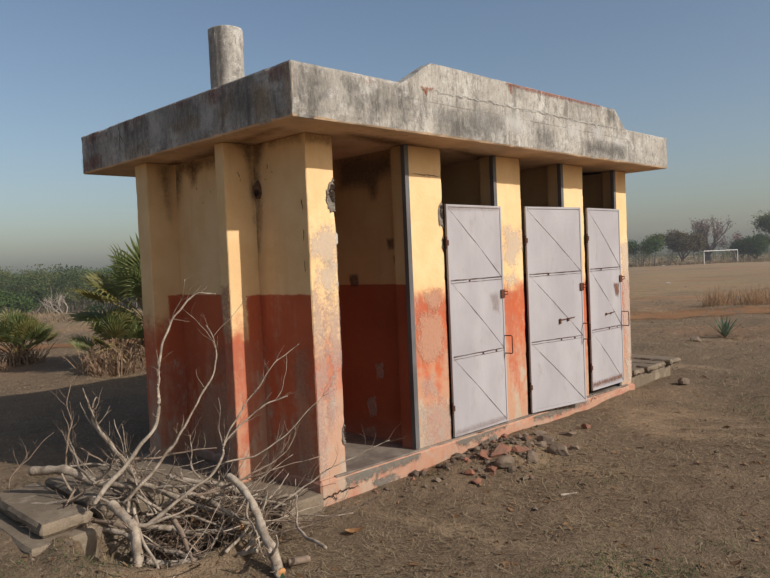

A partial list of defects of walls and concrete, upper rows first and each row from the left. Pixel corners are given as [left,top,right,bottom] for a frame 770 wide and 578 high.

spalling [326,178,336,215]
peeling [311,225,342,455]
crack [323,485,358,500]